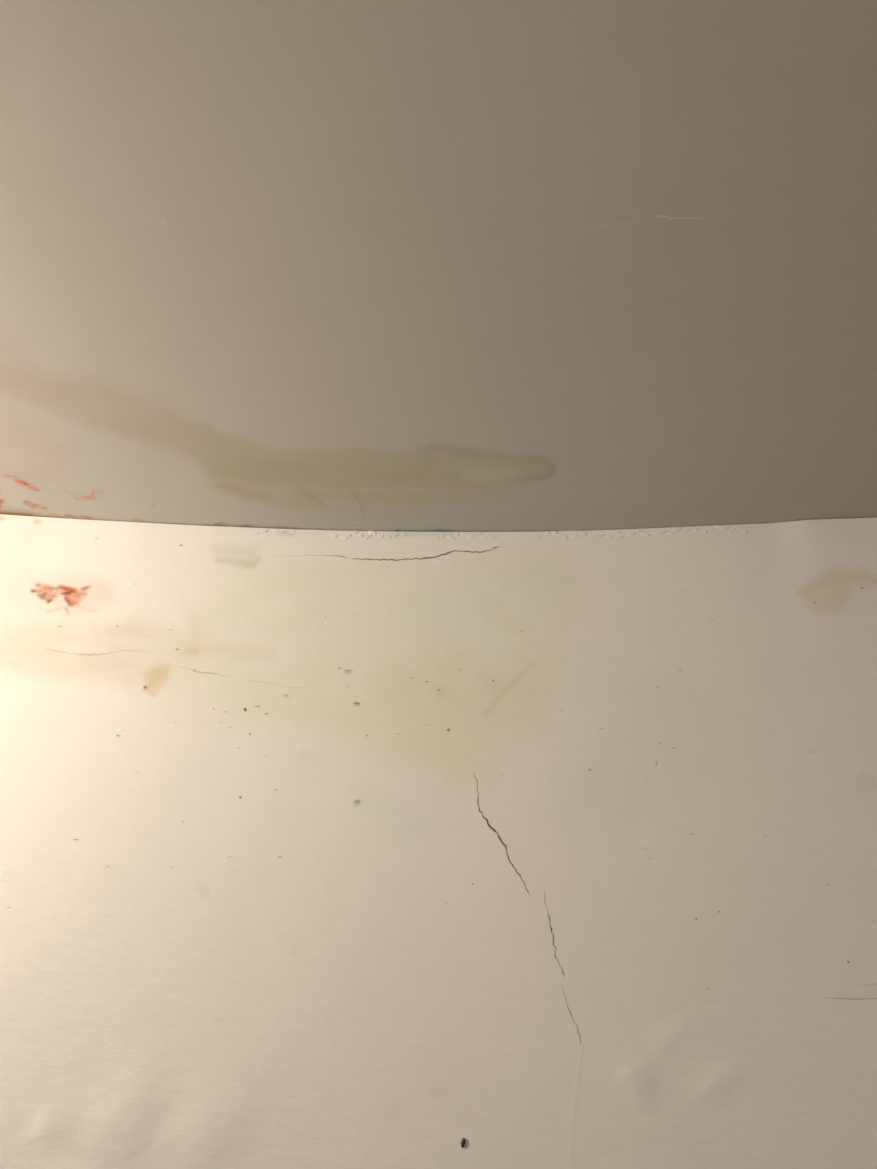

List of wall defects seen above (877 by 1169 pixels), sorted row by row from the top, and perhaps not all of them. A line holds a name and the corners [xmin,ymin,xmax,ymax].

rust [0,391,106,528]
rust [18,566,124,623]
water stain [0,353,612,813]
crack [0,513,877,564]
crack [470,768,585,1051]